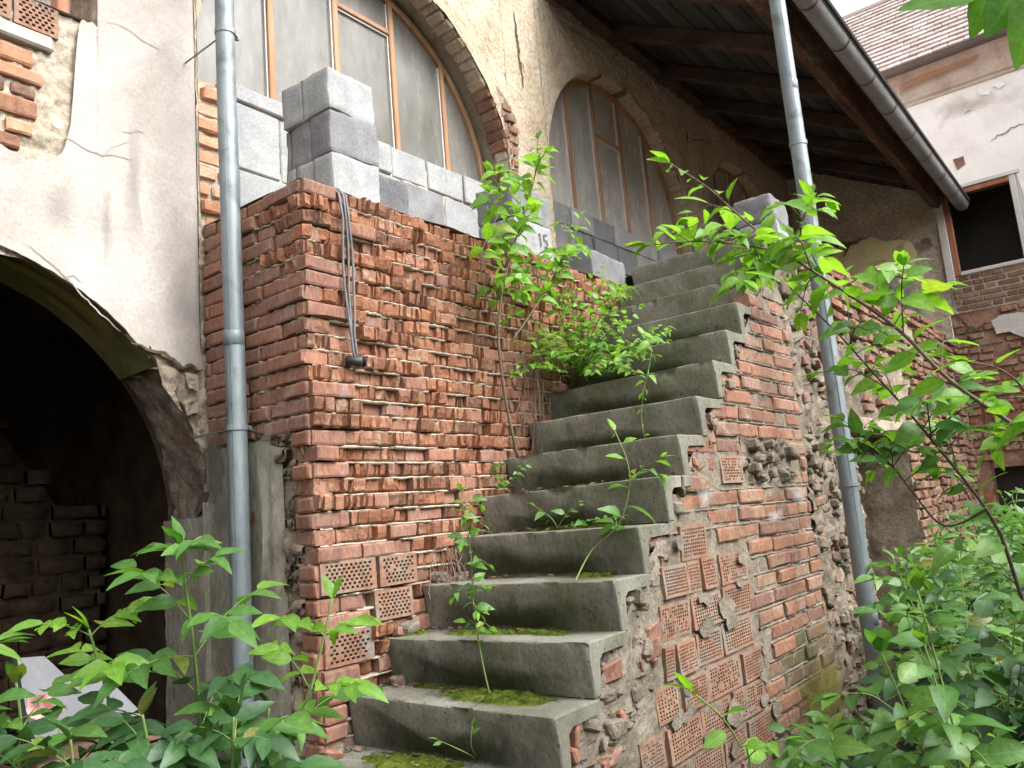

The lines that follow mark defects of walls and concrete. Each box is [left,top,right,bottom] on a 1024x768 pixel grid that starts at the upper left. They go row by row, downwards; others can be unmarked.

crack [514,15,525,88]
flaking render [0,0,80,161]
crack [54,130,144,161]
peeling [833,237,932,283]
peeling [991,312,1024,337]
peeling [135,346,202,460]
spalling [738,436,800,484]